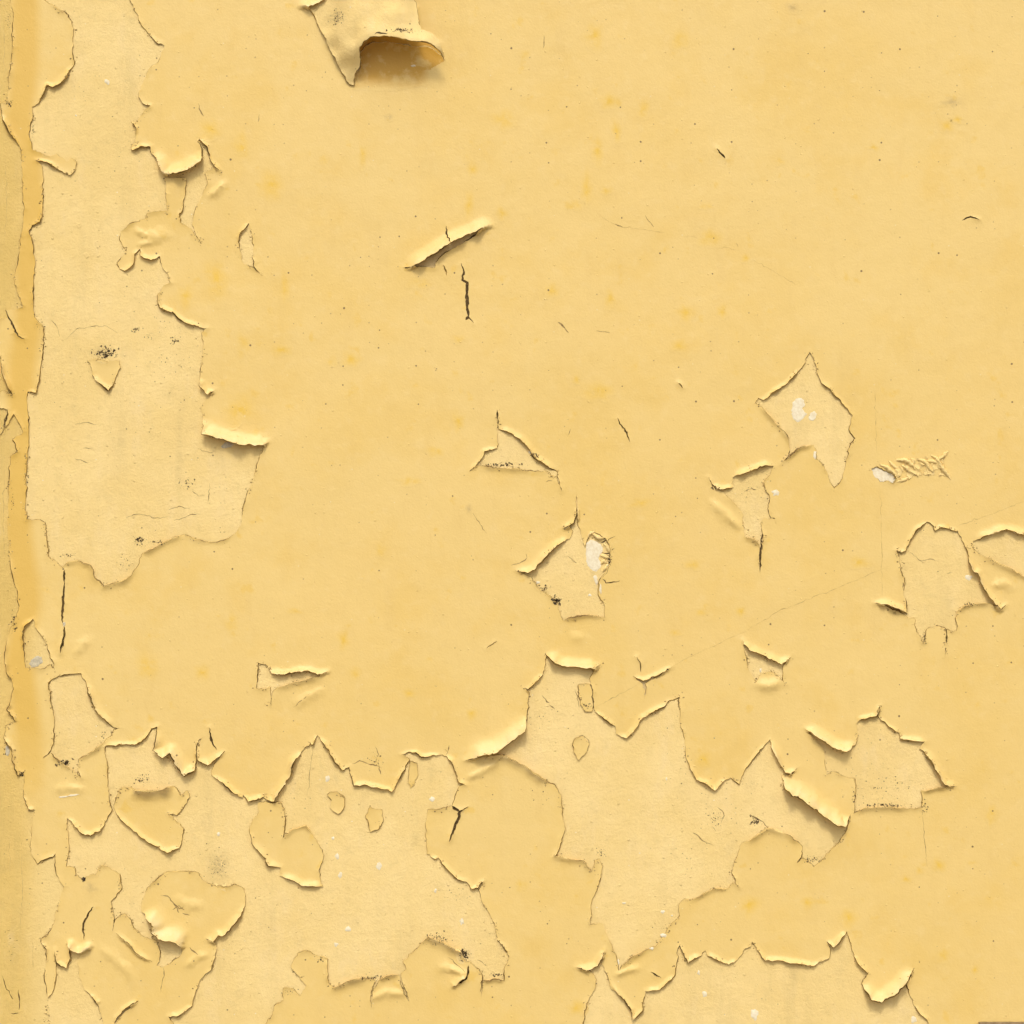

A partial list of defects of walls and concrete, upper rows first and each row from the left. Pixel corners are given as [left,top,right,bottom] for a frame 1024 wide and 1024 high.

peeling [296,0,445,91]
crack [445,226,476,322]
peeling [0,0,271,1024]
peeling [470,409,559,482]
peeling [712,353,854,567]
peeling [872,451,951,483]
peeling [515,499,613,622]
peeling [876,522,1024,654]
peeling [742,642,791,686]
crack [452,807,462,833]
peeling [44,652,956,1024]